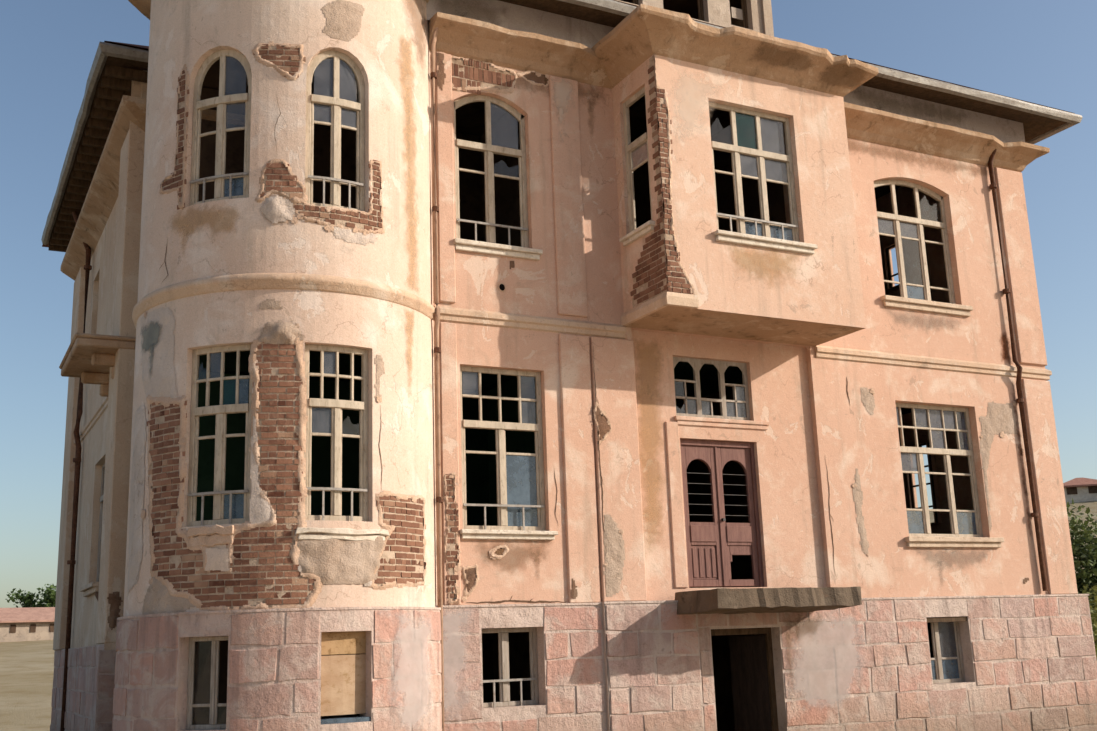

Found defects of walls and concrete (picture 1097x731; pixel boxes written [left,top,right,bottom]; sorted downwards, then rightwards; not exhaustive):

flaking render [252,41,306,80]
flaking render [437,52,550,95]
flaking render [159,64,190,210]
flaking render [255,159,385,245]
flaking render [630,56,698,308]
corrosion [1002,335,1010,361]
flaking render [95,307,324,632]
flaking render [364,491,427,590]
spalling [443,472,480,605]
spalling [488,545,509,560]